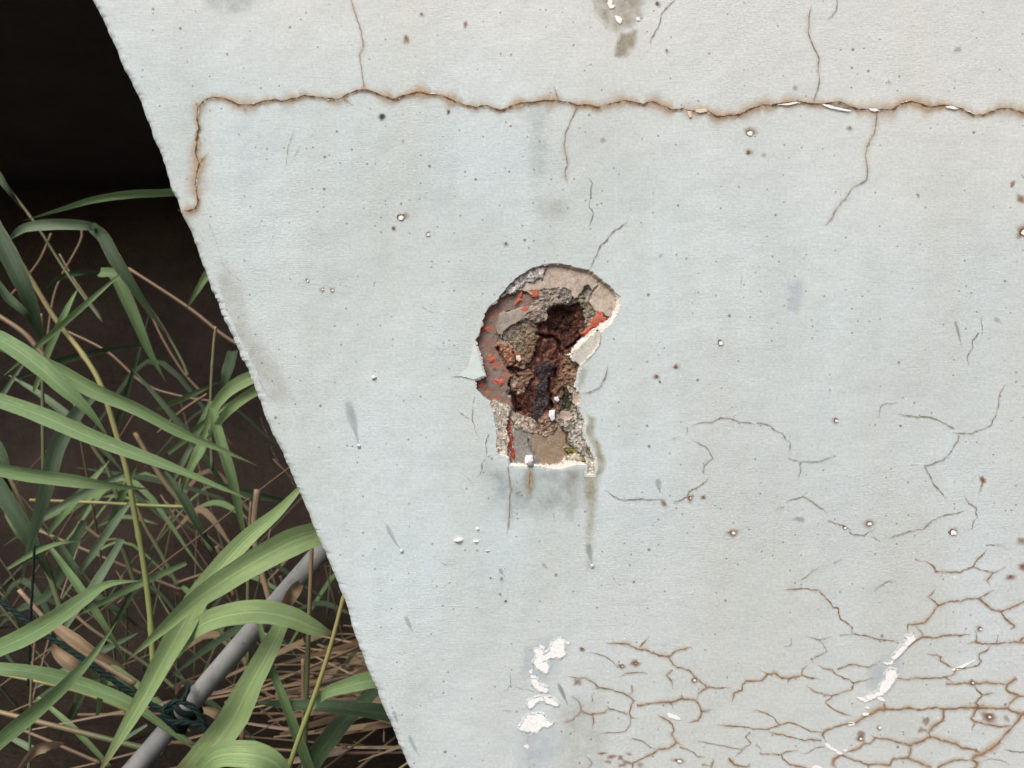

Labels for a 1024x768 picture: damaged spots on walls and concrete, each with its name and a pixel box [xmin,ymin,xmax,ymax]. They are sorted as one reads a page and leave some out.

crack [181,0,1024,266]
spalling [459,263,621,475]
peeling [517,636,570,749]
crack [562,387,1024,768]
peeling [848,633,918,726]